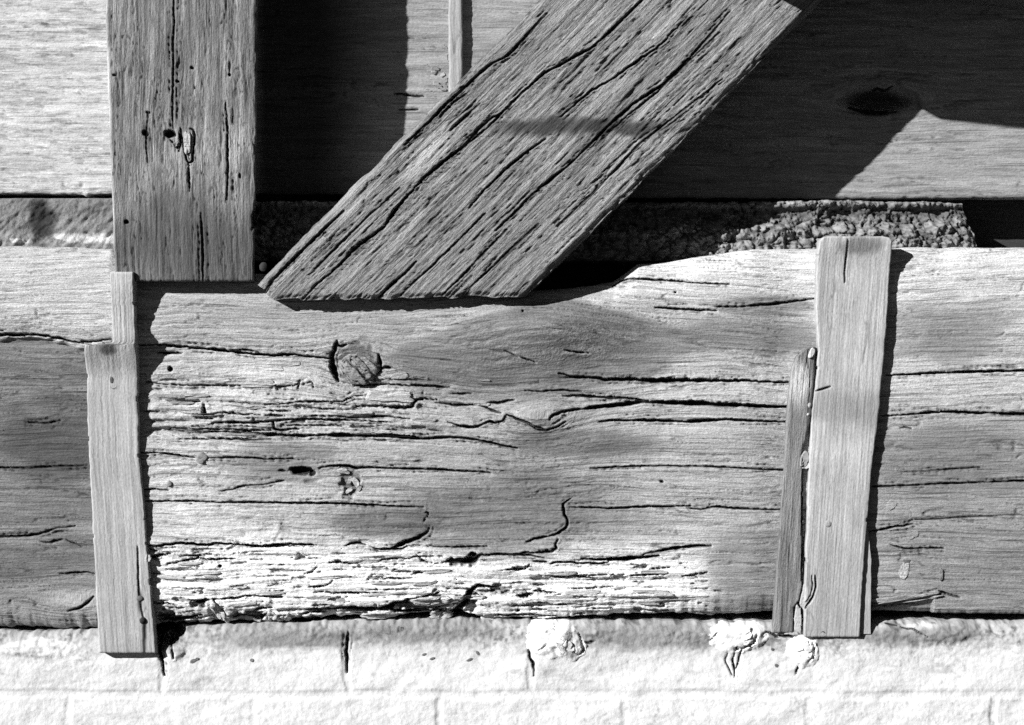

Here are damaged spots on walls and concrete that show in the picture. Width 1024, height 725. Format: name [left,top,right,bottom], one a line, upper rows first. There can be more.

crack [146,0,175,162]
crack [223,102,231,199]
crack [265,0,730,298]
crack [198,214,206,279]
crack [886,368,1024,376]
crack [26,418,60,426]
crack [881,411,1024,429]
crack [0,463,87,471]
crack [137,341,817,677]
crack [870,515,993,549]
crack [872,467,1024,487]
crack [0,526,94,611]